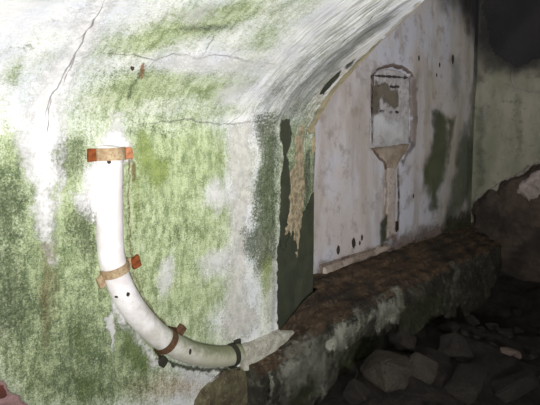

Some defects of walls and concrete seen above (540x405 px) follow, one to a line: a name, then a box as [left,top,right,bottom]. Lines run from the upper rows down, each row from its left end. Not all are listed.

damp [17,0,113,264]
damp [101,115,134,164]
damp [209,122,260,340]
peeling [285,39,383,256]
damp [355,61,477,263]
spalling [471,162,540,282]
damp [105,302,162,367]
damp [168,361,237,372]
damp [280,341,318,405]
damp [325,286,405,361]